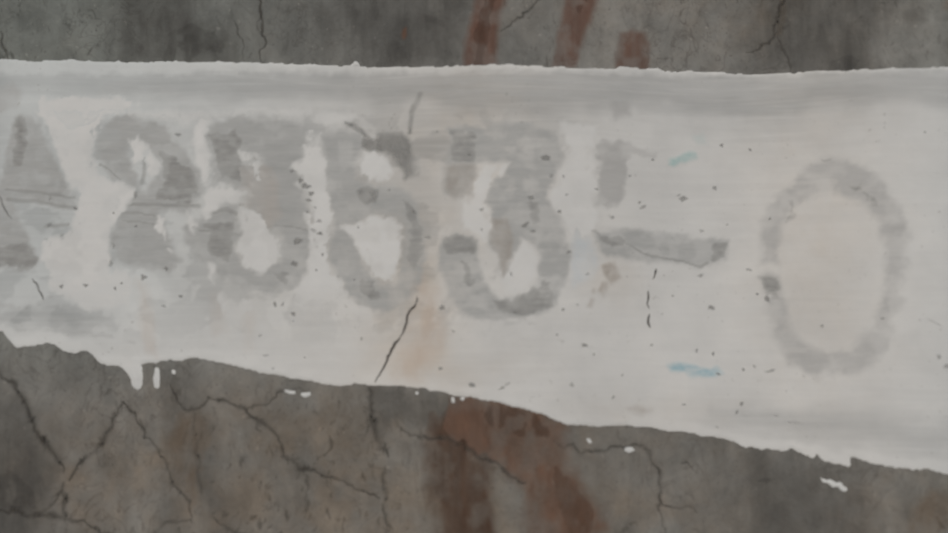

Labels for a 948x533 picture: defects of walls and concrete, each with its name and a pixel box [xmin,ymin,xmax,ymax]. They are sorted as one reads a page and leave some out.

corrosion [461,0,511,66]
corrosion [550,0,601,69]
corrosion [611,26,653,69]
crack [375,298,417,382]
corrosion [416,394,615,533]